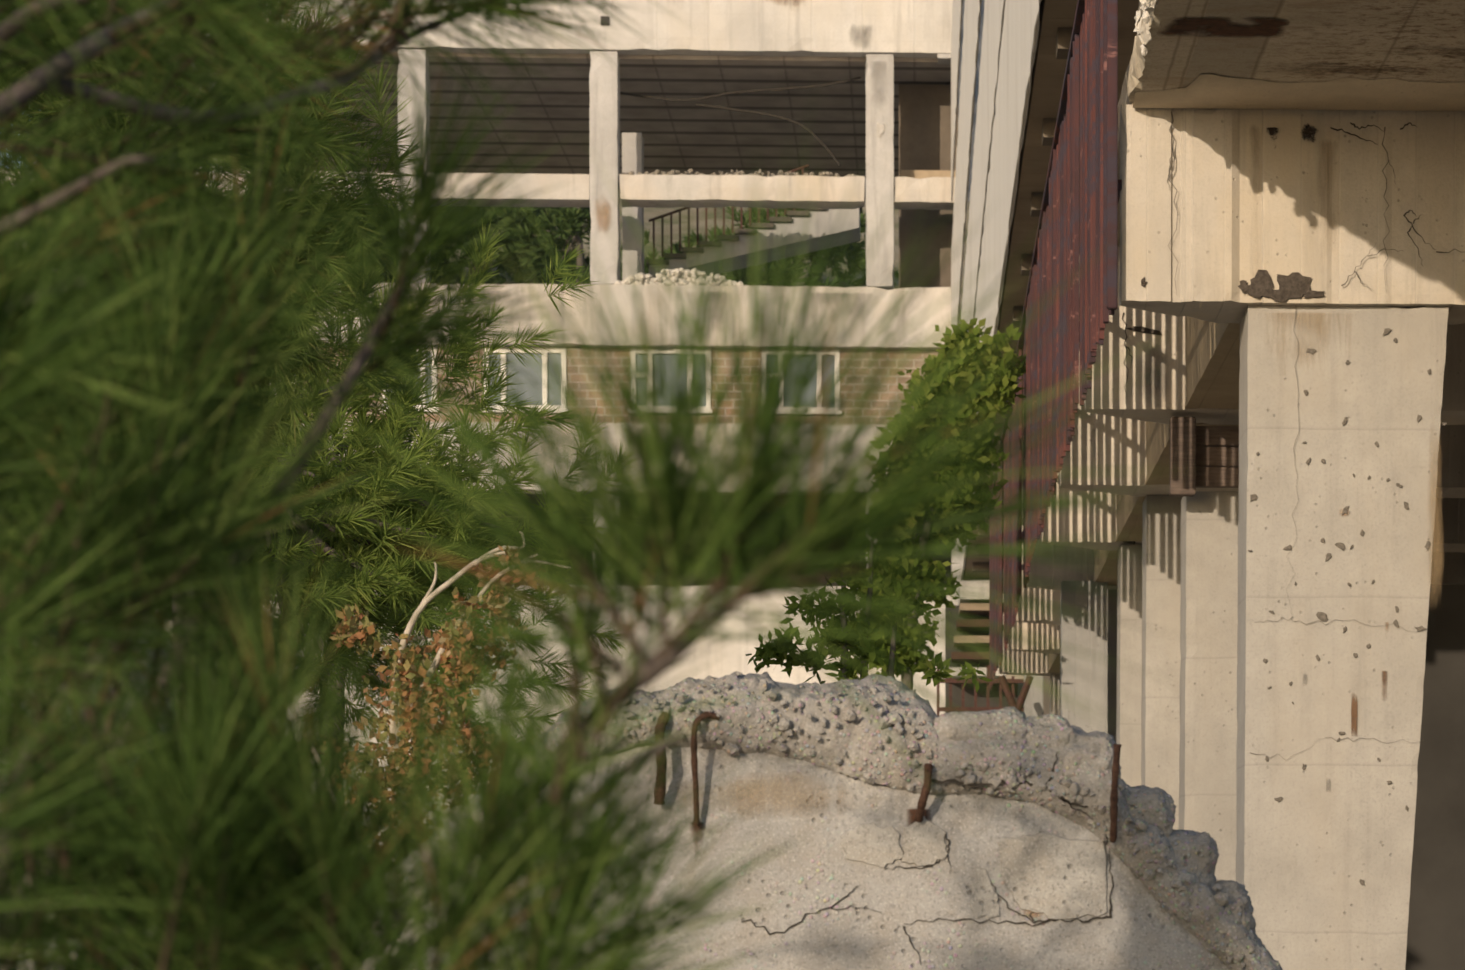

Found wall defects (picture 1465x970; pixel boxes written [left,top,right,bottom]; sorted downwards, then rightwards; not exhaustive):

spalling [1133,0,1159,56]
corrosion [1161,18,1289,37]
crack [1331,122,1460,293]
spalling [1238,270,1325,302]
crack [1122,312,1132,402]
spalling [504,671,1283,970]
corrosion [908,809,929,825]
crack [741,752,1114,964]